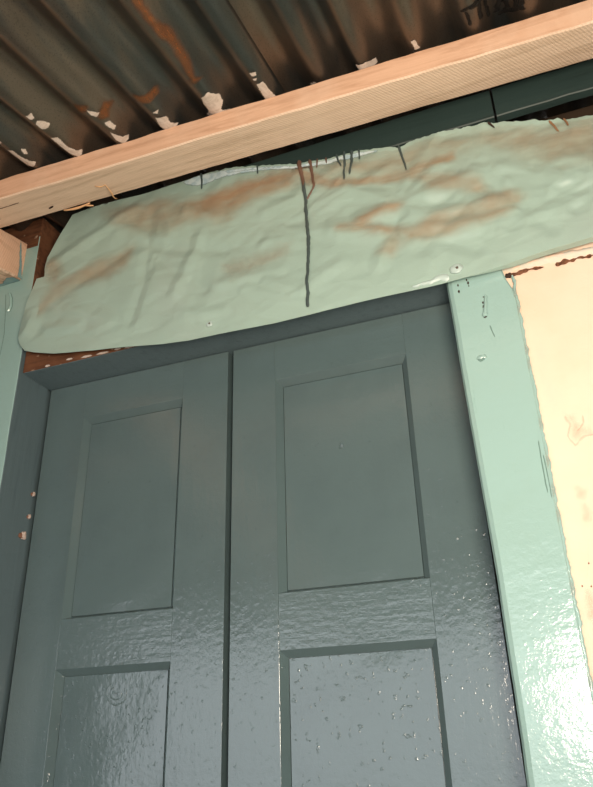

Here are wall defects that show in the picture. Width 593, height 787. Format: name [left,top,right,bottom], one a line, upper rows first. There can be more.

corrosion [133,0,201,83]
peeling [249,72,275,99]
peeling [201,92,228,116]
peeling [26,113,50,129]
peeling [105,121,129,143]
peeling [153,110,178,130]
peeling [8,149,36,166]
peeling [51,137,83,156]
damp [297,149,360,307]